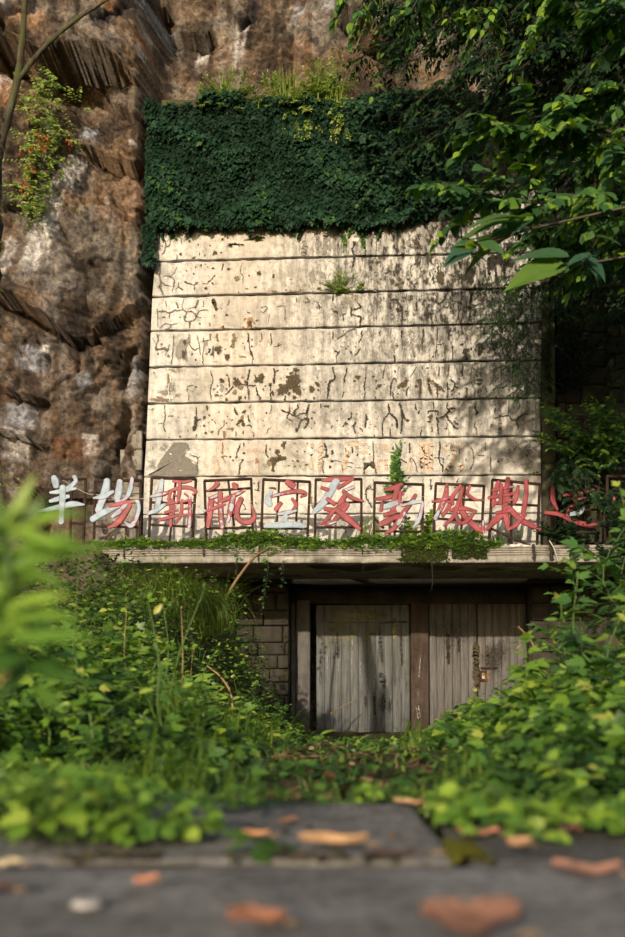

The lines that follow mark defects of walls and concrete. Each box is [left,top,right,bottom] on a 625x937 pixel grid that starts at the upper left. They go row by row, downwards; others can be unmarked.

crack [151,237,529,510]